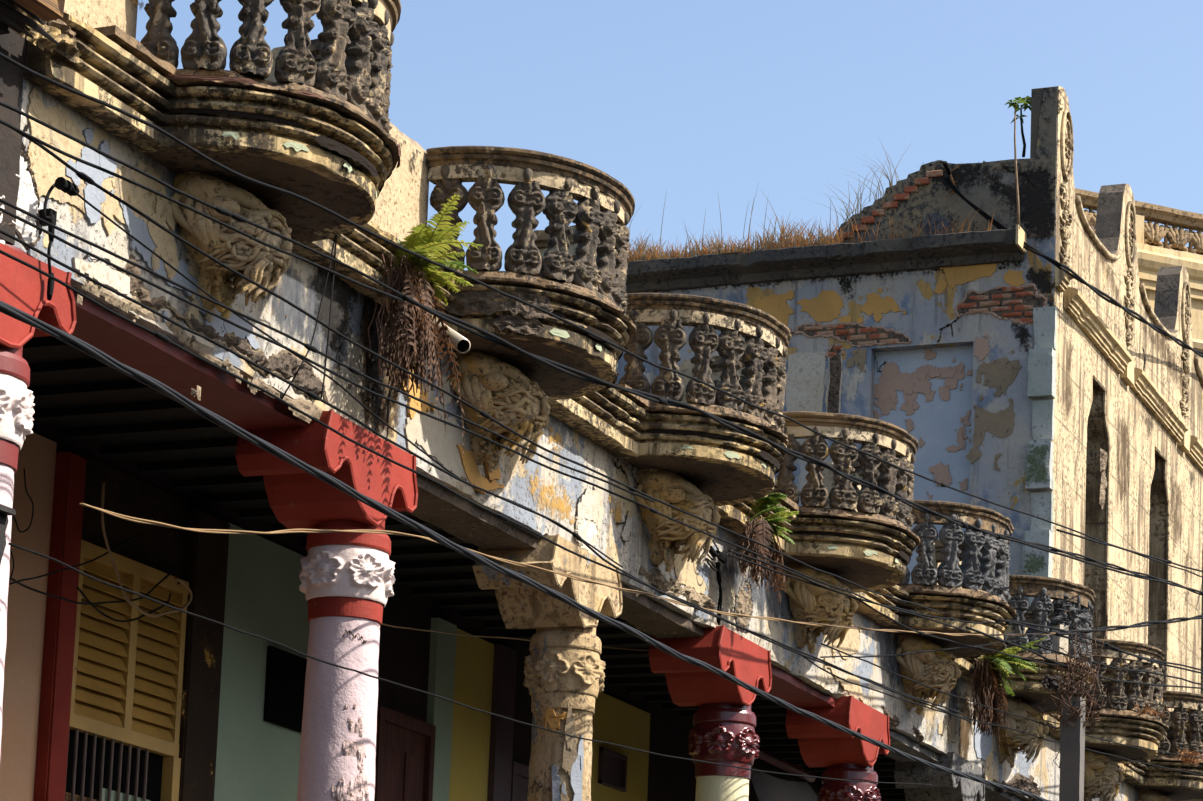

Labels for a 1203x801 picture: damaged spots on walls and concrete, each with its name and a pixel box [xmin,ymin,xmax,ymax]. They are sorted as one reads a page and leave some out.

leakage [922,140,1060,243]
peeling [0,87,328,423]
flaking render [934,263,1047,325]
peeling [753,288,1022,500]
leakage [1064,342,1074,417]
leakage [1144,323,1190,405]
leakage [1118,420,1131,505]
leakage [1170,477,1189,601]